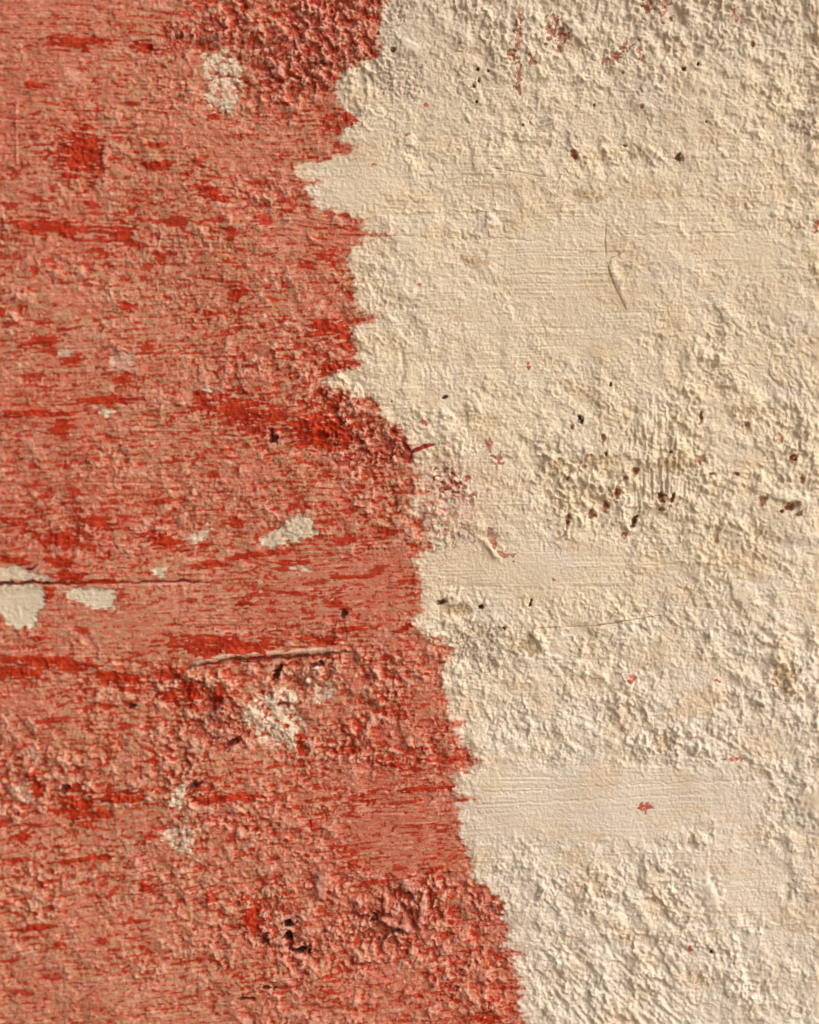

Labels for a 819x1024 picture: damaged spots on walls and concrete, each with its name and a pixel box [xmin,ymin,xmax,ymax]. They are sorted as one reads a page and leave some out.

spalling [151,0,429,114]
peeling [259,513,320,549]
crack [0,565,211,586]
peeling [0,565,52,630]
peeling [64,586,117,610]
crack [182,648,350,671]